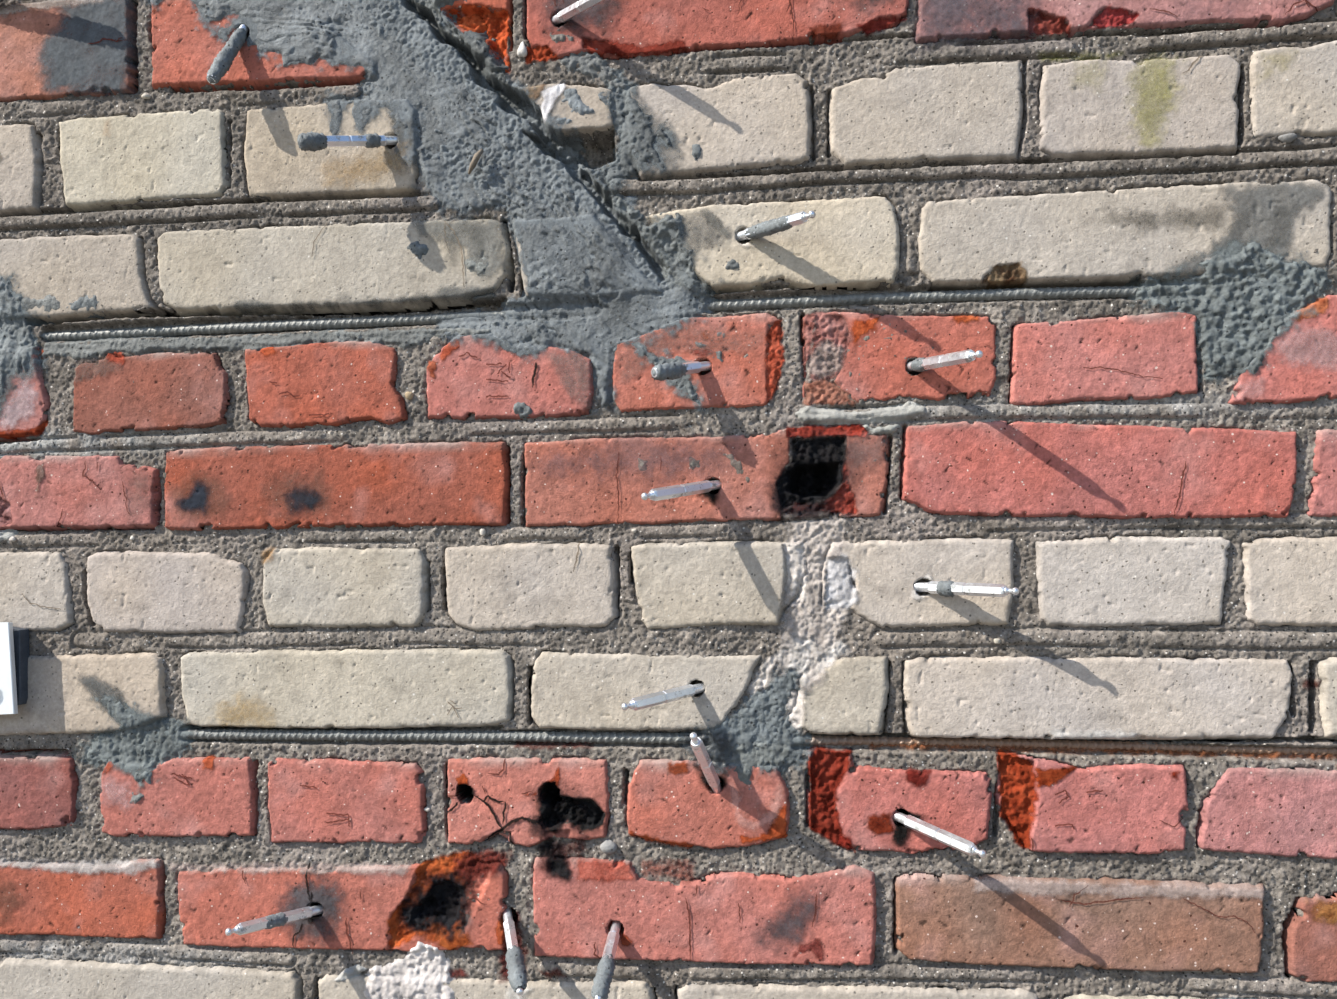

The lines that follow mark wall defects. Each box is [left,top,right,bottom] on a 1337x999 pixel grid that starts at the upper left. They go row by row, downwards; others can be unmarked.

spalling [786,424,867,438]
crack [82,462,129,513]
spalling [818,463,857,515]
damp [749,515,858,729]
corrosion [870,742,1337,759]
crack [448,758,546,845]
spalling [629,831,694,848]
spalling [807,745,852,850]
spalling [868,813,894,834]
spalling [906,769,931,787]
spalling [996,749,1076,848]
corrosion [454,849,508,886]